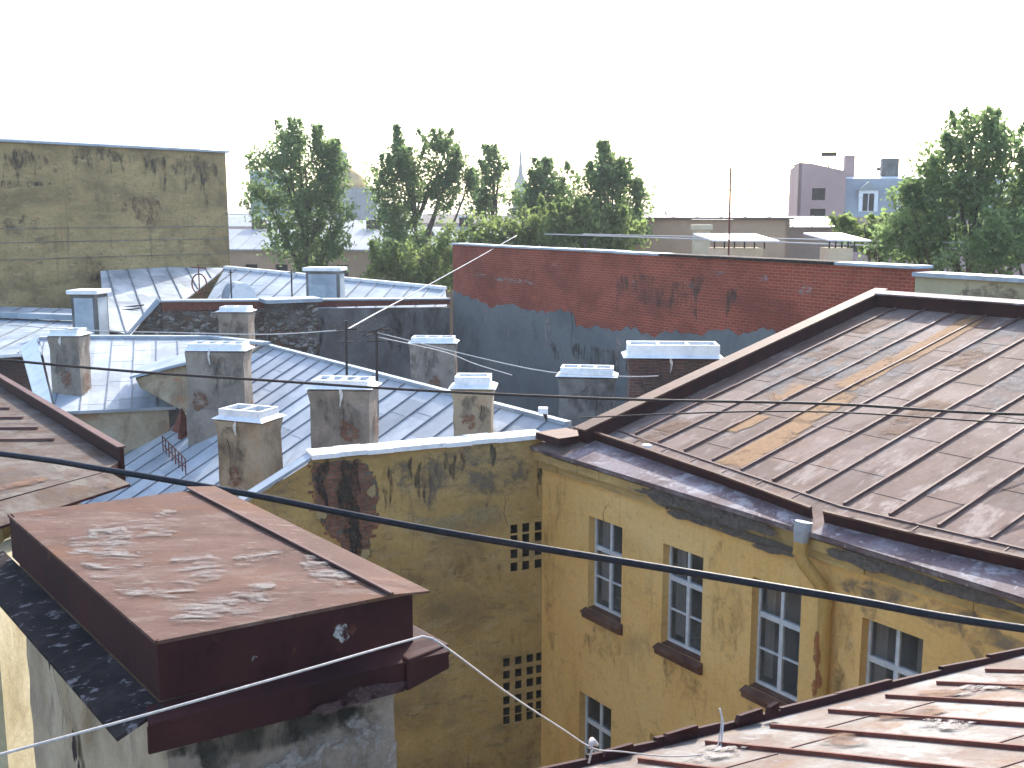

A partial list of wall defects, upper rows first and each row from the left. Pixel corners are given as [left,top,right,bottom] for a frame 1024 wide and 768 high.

flaking render [453,290,780,418]
damp [383,443,542,508]
peeling [70,509,176,578]
peeling [117,556,275,621]
peeling [303,555,356,585]
flaking render [307,458,381,560]
flaking render [648,488,794,558]
peeling [333,624,349,643]
corrosion [812,632,822,696]
corrosion [880,689,964,718]